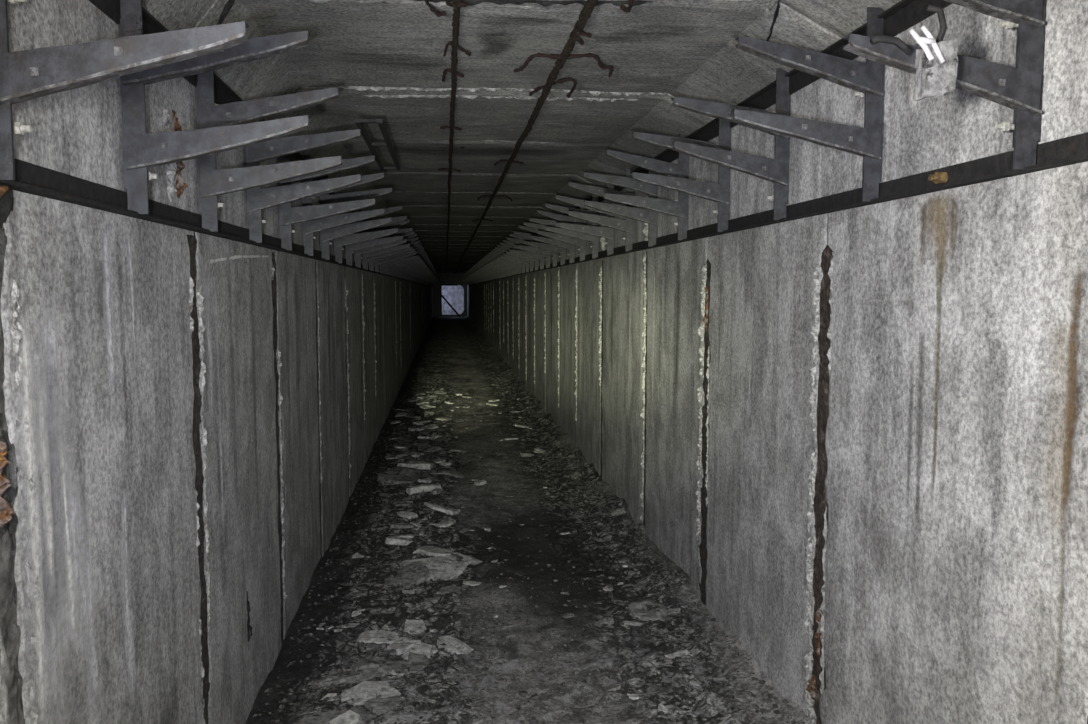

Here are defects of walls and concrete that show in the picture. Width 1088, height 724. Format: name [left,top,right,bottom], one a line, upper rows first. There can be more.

spalling [0,185,14,229]
rust [922,200,953,475]
rust [0,441,18,534]